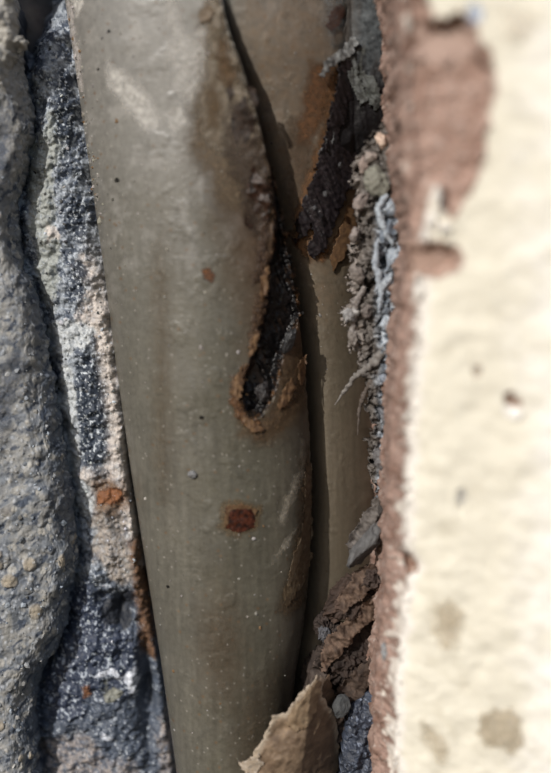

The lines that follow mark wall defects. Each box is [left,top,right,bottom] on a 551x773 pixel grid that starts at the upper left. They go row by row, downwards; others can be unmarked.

rust [94,480,129,513]
rust [218,500,262,537]
spalling [403,551,419,575]
spalling [238,674,340,773]